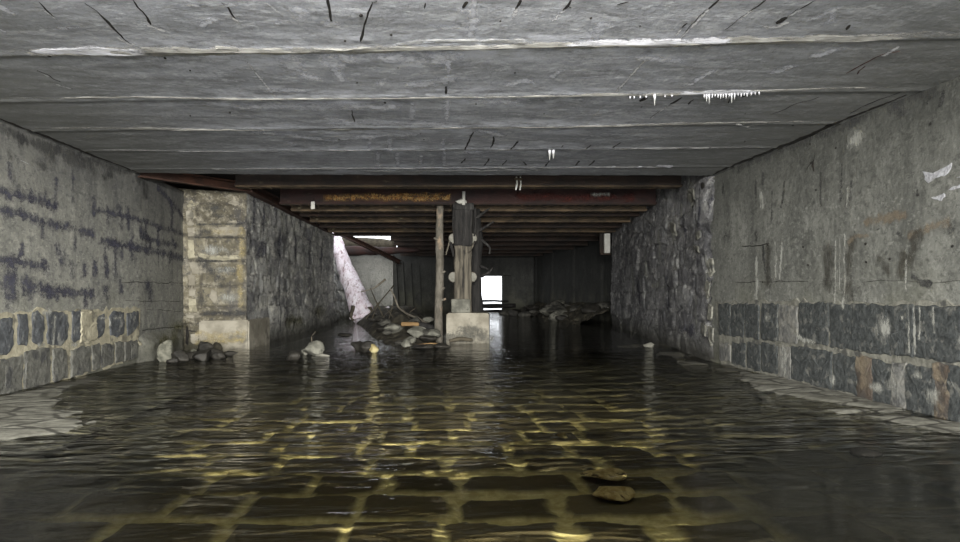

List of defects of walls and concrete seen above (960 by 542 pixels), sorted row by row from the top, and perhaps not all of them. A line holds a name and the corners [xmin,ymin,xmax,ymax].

crack [86,0,166,46]
crack [325,0,333,22]
crack [360,1,377,42]
crack [675,0,719,39]
crack [725,0,815,30]
water stain [12,0,958,173]
crack [461,132,550,166]
rust [324,192,451,202]
water stain [754,231,783,300]
water stain [824,233,853,309]
water stain [878,232,923,289]
efflorescence [901,307,921,354]